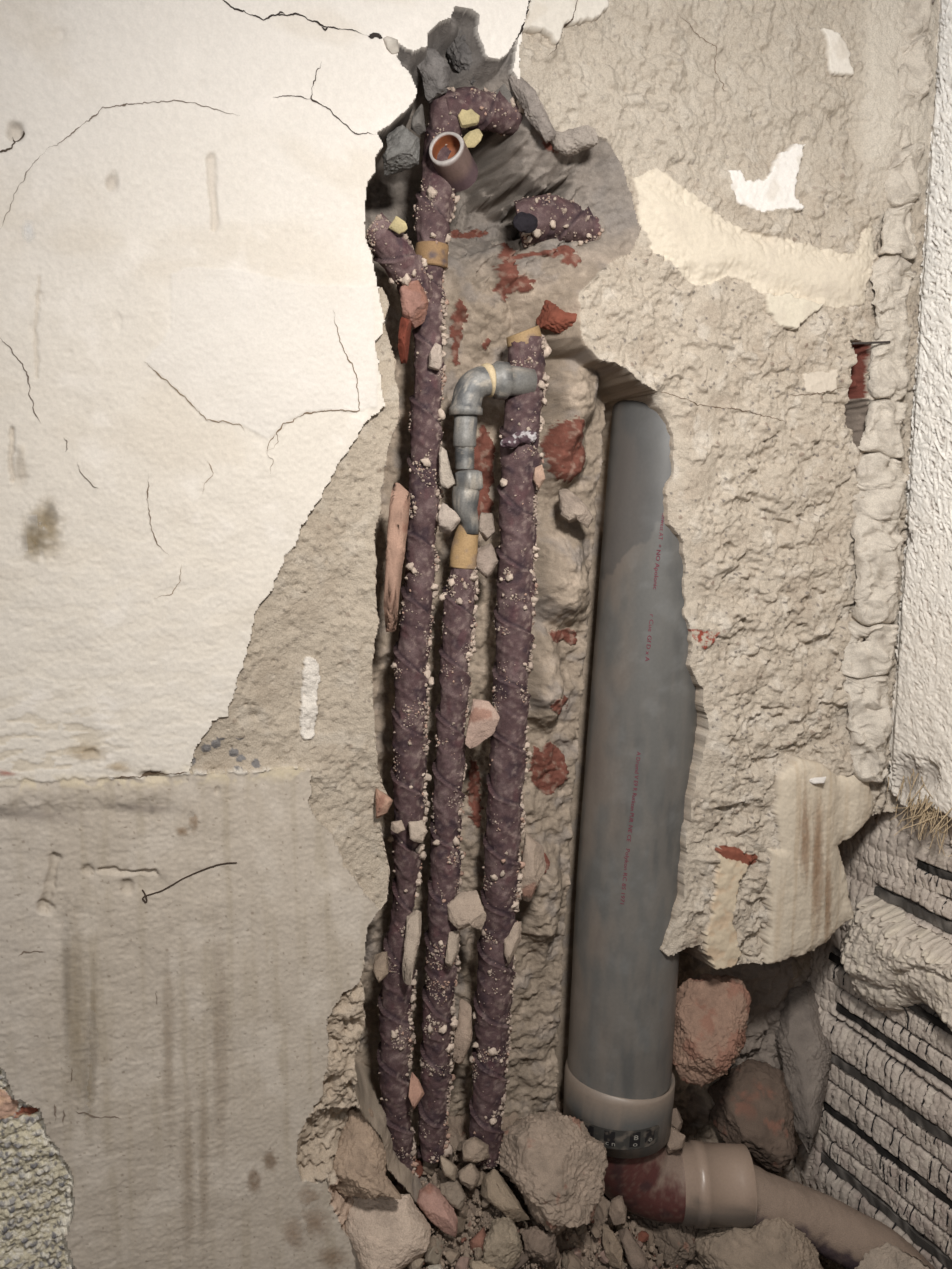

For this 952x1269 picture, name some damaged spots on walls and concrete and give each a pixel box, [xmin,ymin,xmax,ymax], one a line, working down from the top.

crack [223,0,383,39]
crack [0,100,233,226]
crack [277,68,371,135]
spalling [189,0,940,1241]
spalling [0,1067,77,1269]